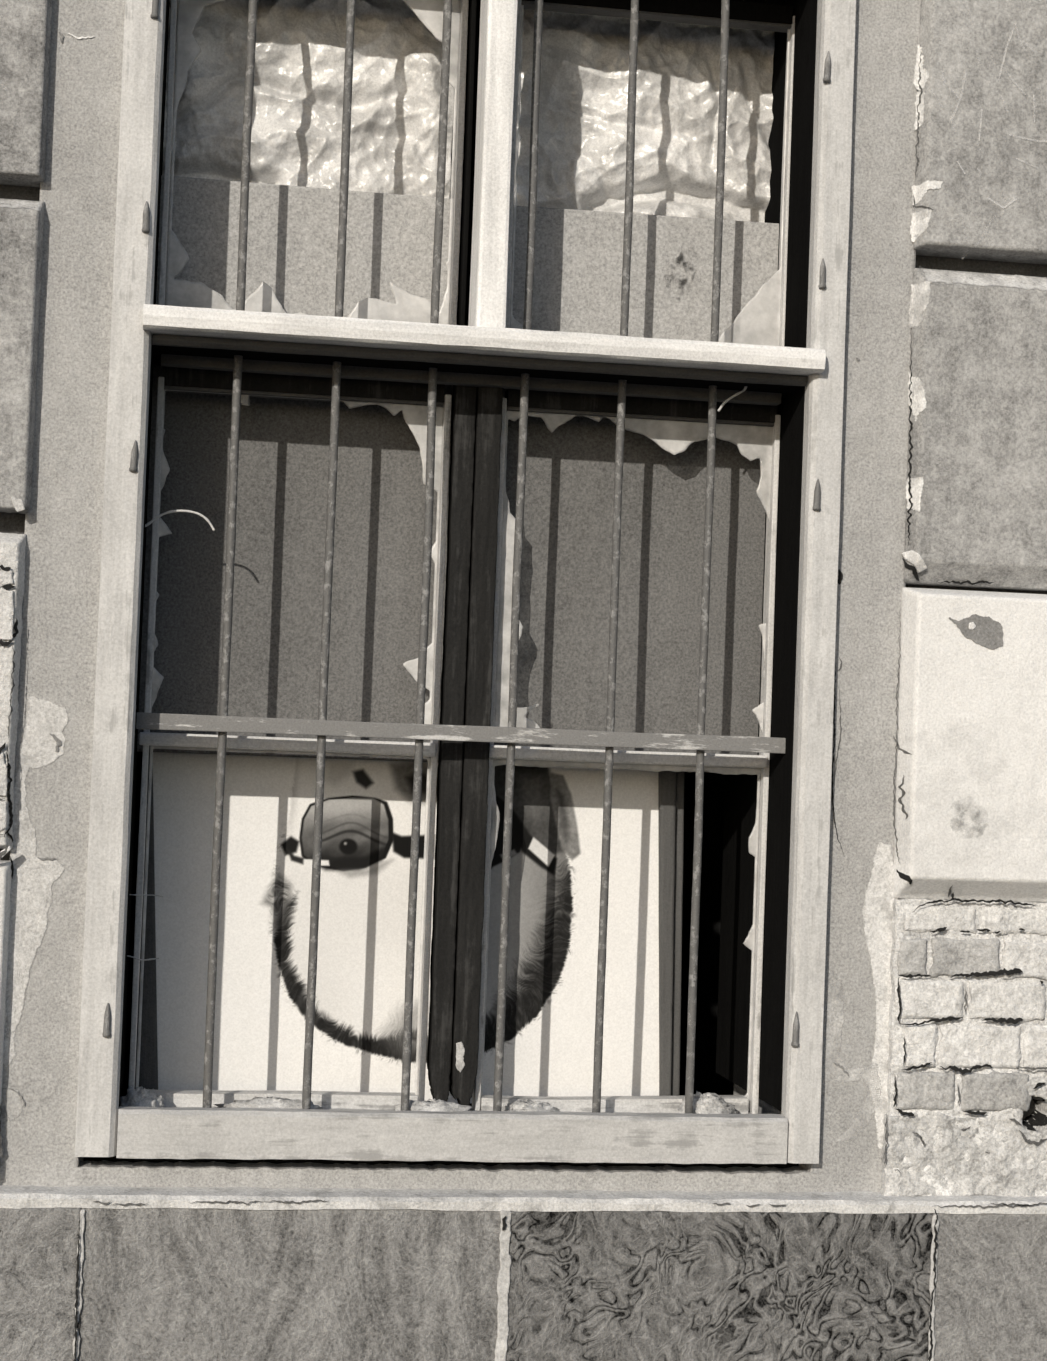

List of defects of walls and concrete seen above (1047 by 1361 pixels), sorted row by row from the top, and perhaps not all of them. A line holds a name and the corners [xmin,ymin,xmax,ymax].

peeling [0,1087,25,1157]
peeling [0,565,68,1068]
flaking render [824,613,1047,1197]